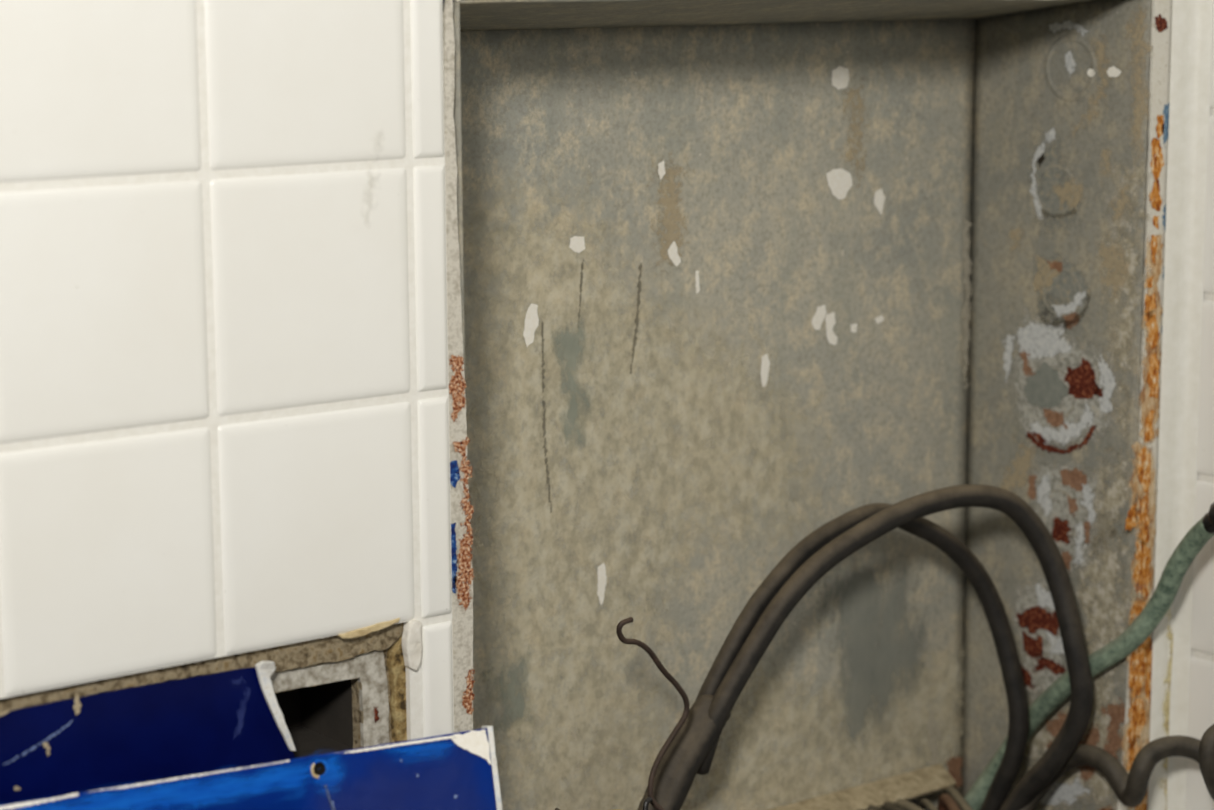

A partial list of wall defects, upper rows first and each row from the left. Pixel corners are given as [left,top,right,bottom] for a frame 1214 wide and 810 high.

corrosion [1155,14,1168,32]
peeling [1162,103,1170,146]
corrosion [449,355,467,422]
corrosion [1125,115,1164,626]
peeling [450,460,460,488]
corrosion [453,437,475,614]
spalling [0,618,491,810]
corrosion [1121,636,1153,774]
corrosion [1101,788,1148,810]